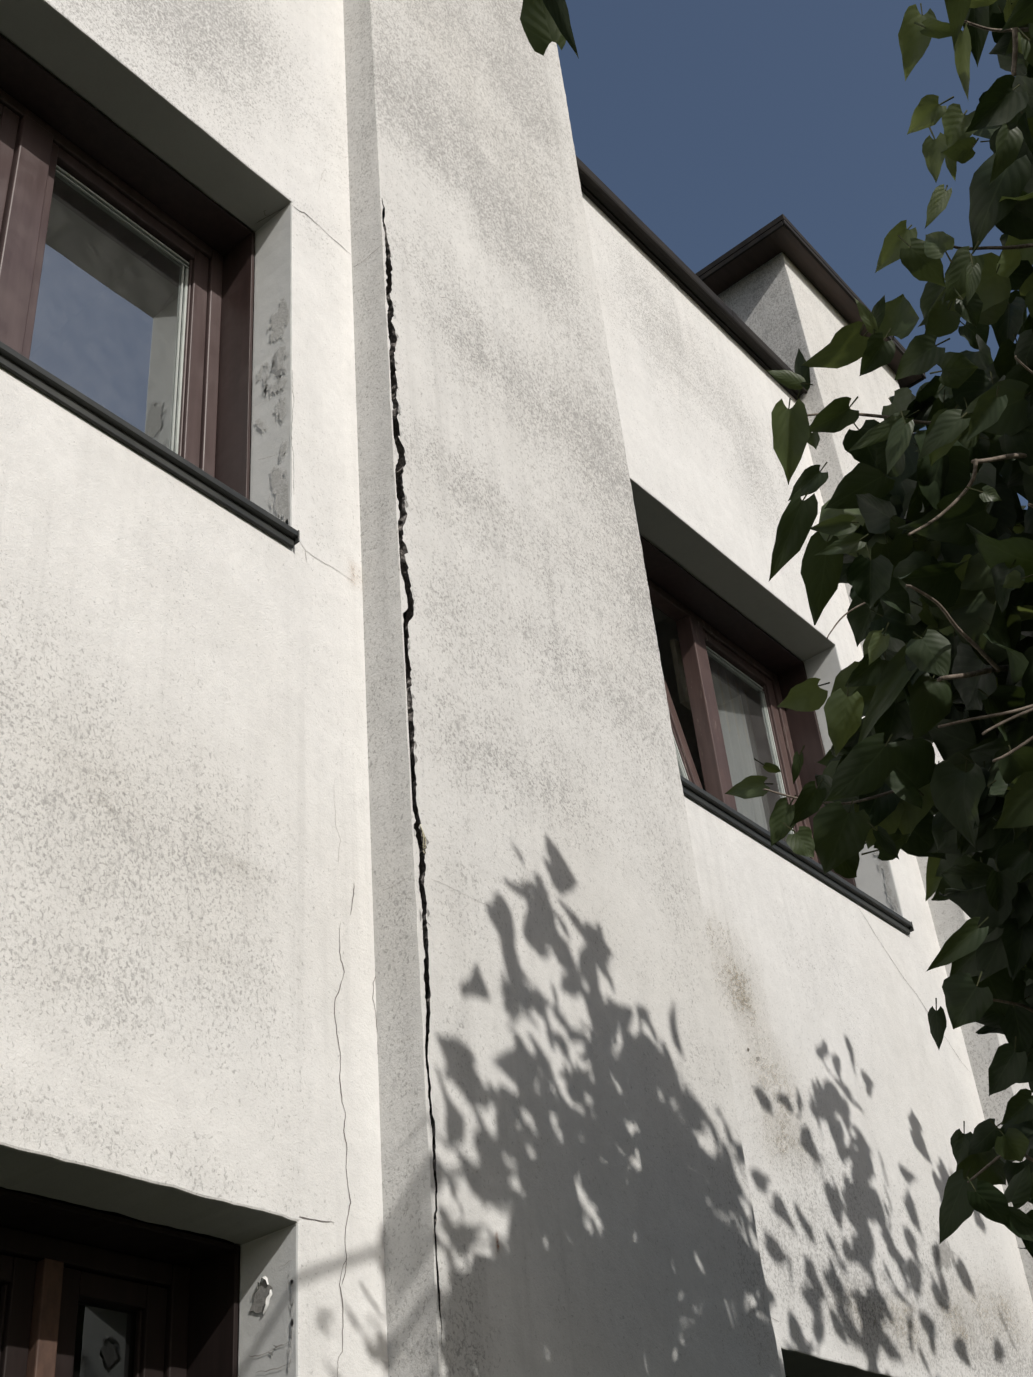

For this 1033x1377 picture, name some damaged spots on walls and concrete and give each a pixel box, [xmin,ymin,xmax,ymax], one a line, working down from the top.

peeling [255,297,289,431]
peeling [269,440,289,524]
crack [250,150,491,1377]
peeling [250,1263,293,1371]